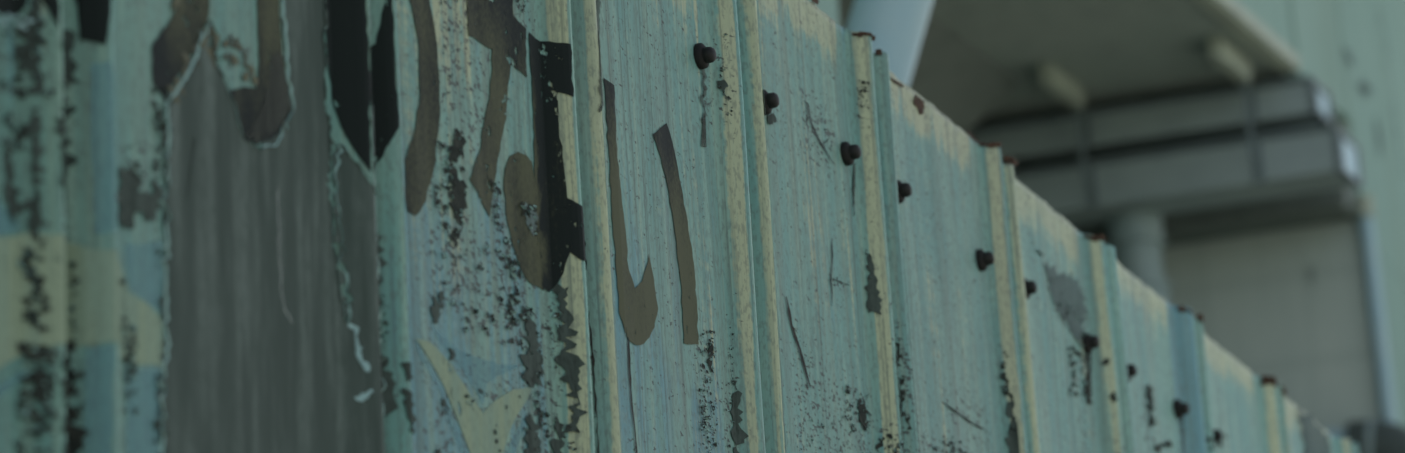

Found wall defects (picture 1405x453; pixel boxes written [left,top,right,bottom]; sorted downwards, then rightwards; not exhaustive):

peeling [0,0,90,453]
peeling [116,0,428,453]
peeling [431,128,588,453]
peeling [717,34,733,124]
peeling [758,13,968,453]
peeling [1000,351,1020,453]
peeling [1033,242,1110,404]
peeling [1296,408,1331,453]